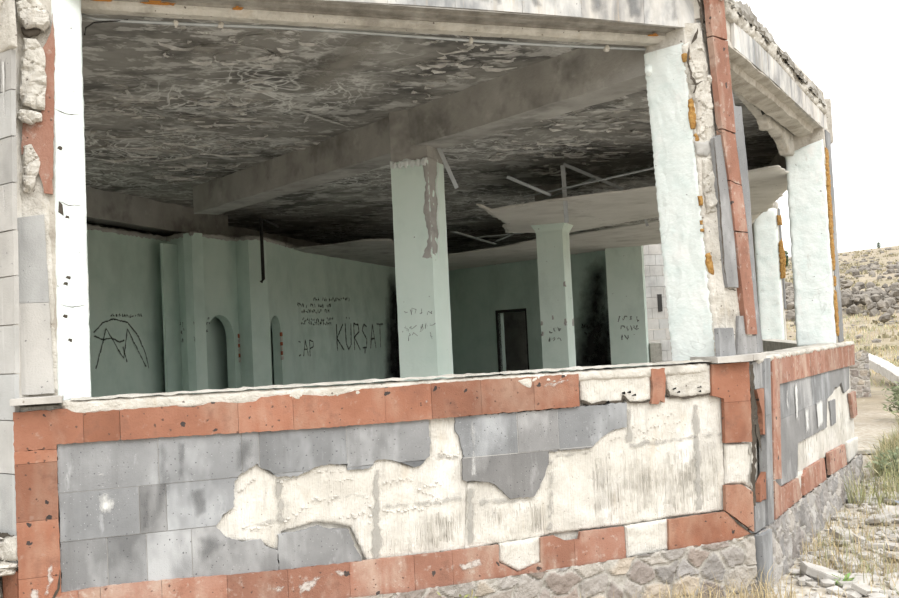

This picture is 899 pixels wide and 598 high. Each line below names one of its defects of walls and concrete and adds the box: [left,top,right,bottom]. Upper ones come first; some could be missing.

spalling [0,0,50,125]
peeling [87,26,318,184]
spalling [22,144,40,193]
spalling [390,156,440,258]
spalling [216,365,753,571]
spalling [785,386,858,498]